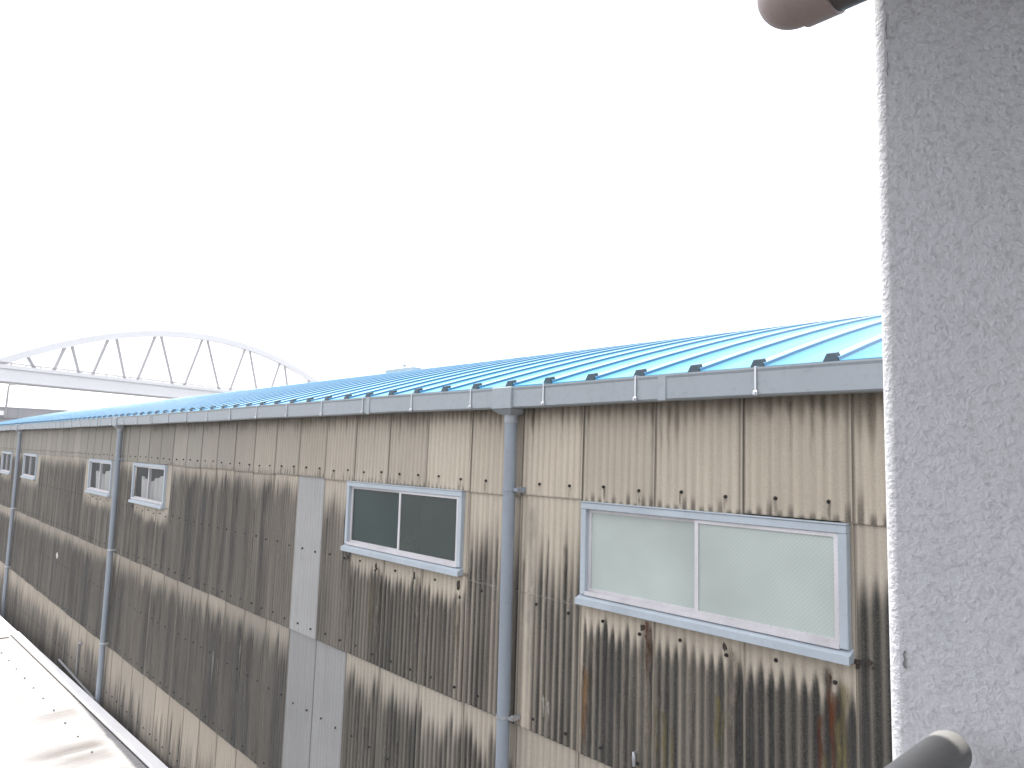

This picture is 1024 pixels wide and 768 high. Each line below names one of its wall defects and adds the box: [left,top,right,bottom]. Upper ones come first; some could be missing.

leakage [0,458,297,768]
leakage [316,505,500,716]
leakage [343,672,496,768]
leakage [511,557,893,768]
corrosion [818,671,837,768]